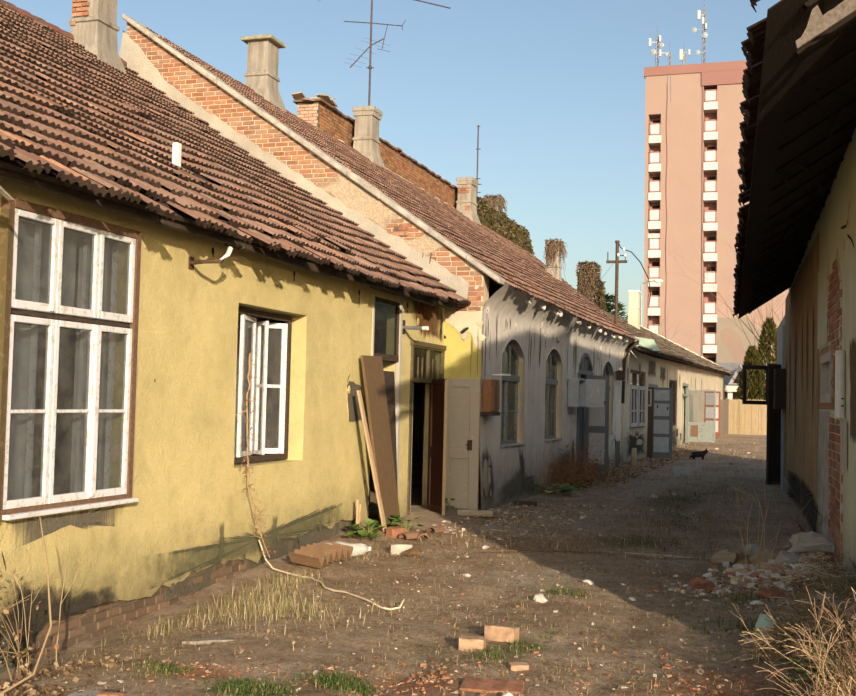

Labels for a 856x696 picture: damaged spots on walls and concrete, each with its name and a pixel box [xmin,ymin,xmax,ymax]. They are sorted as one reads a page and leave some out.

water stain [477,319,511,373]
water stain [528,328,577,378]
spalling [827,249,842,358]
water stain [503,453,534,498]
water stain [0,587,114,673]
spalling [24,520,354,662]